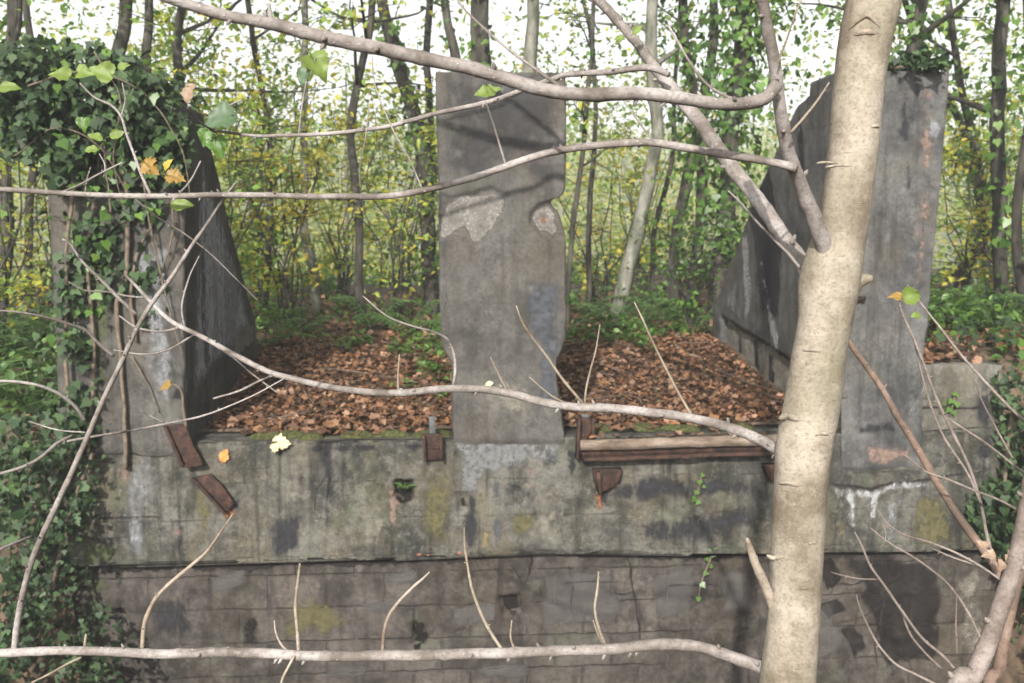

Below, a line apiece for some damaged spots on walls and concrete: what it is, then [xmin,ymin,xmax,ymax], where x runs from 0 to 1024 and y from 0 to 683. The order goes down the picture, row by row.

spalling [440,193,505,242]
spalling [533,206,557,235]
water stain [837,482,920,526]
water stain [271,517,299,556]
water stain [644,508,752,540]